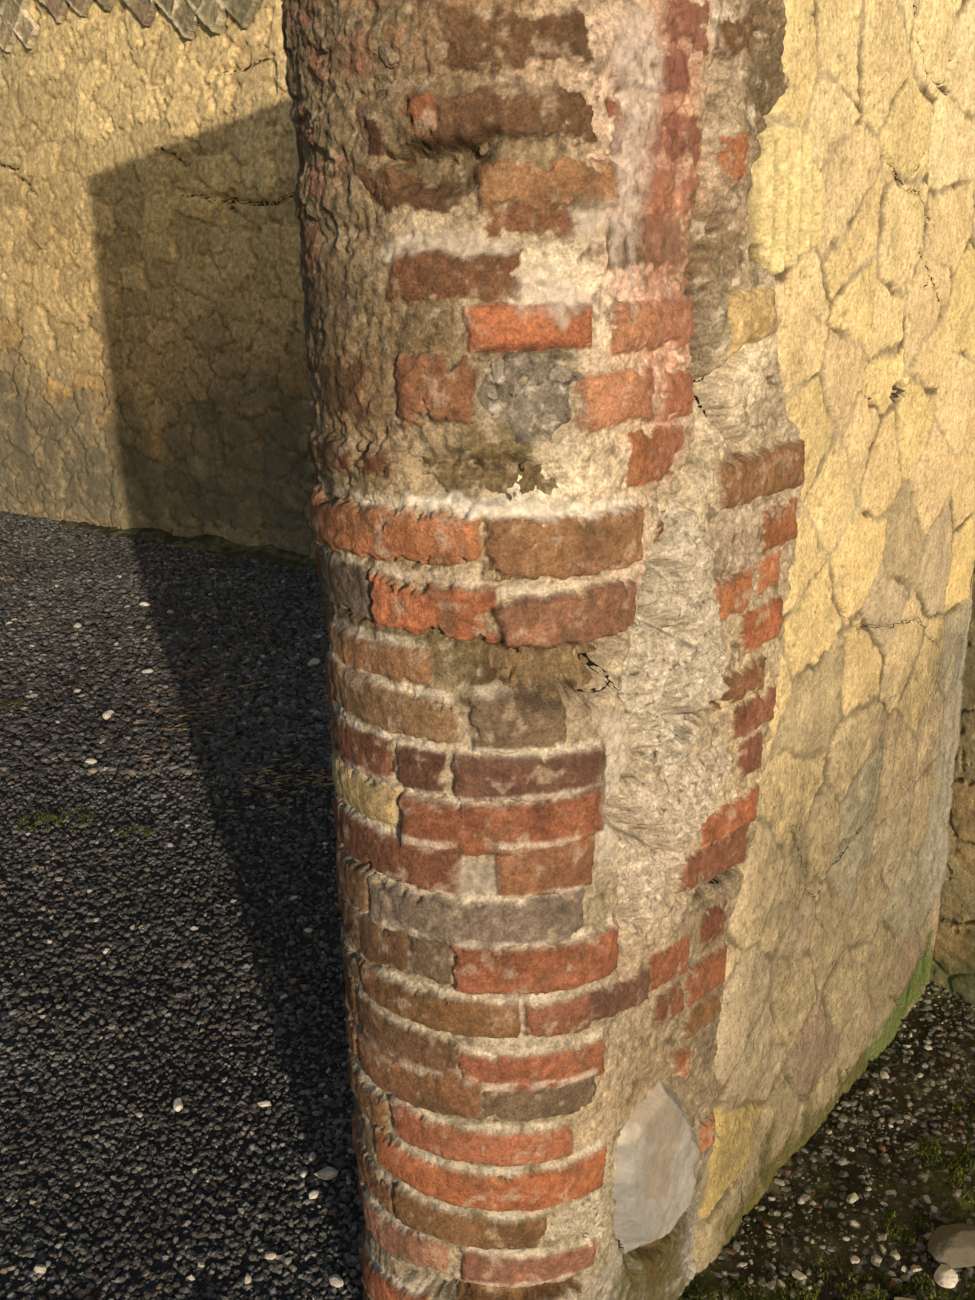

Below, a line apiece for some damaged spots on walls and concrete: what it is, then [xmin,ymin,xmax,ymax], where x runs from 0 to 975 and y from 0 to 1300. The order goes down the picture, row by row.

spalling [285,0,417,255]
spalling [394,140,490,191]
spalling [476,349,586,444]
spalling [419,450,558,500]